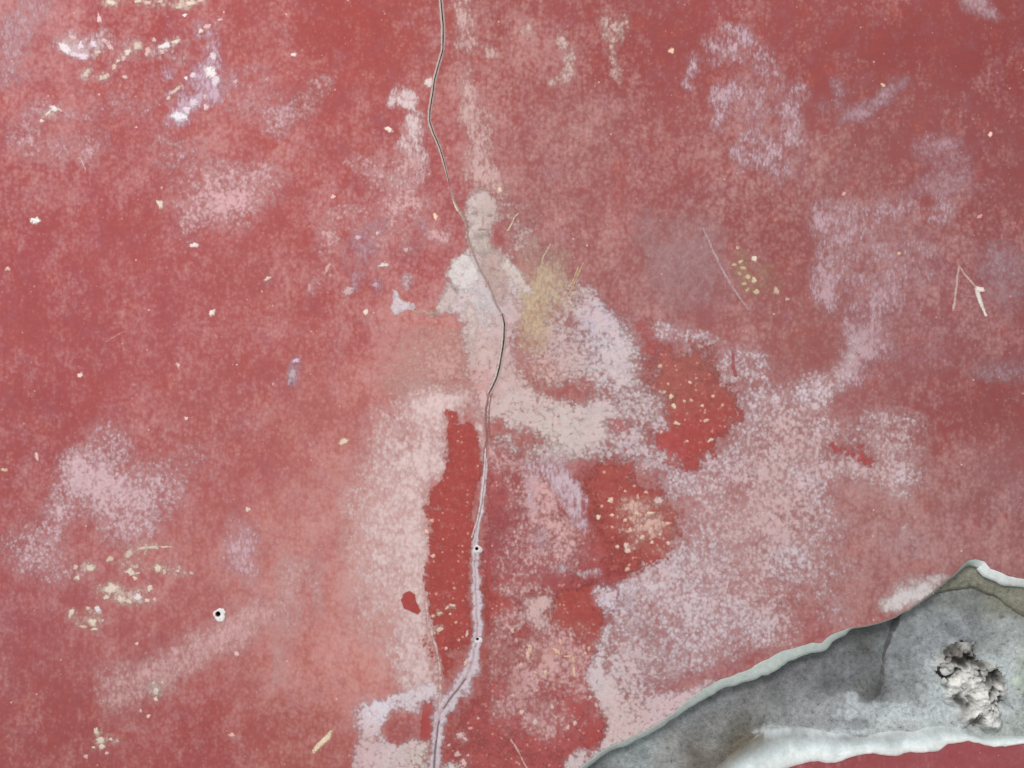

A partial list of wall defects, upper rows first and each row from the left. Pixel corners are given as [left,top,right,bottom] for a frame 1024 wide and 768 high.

crack [423,0,507,768]
damp [513,596,553,631]
damp [524,444,588,529]
flaking render [401,319,1024,768]
damp [809,135,970,390]
damp [880,575,945,612]